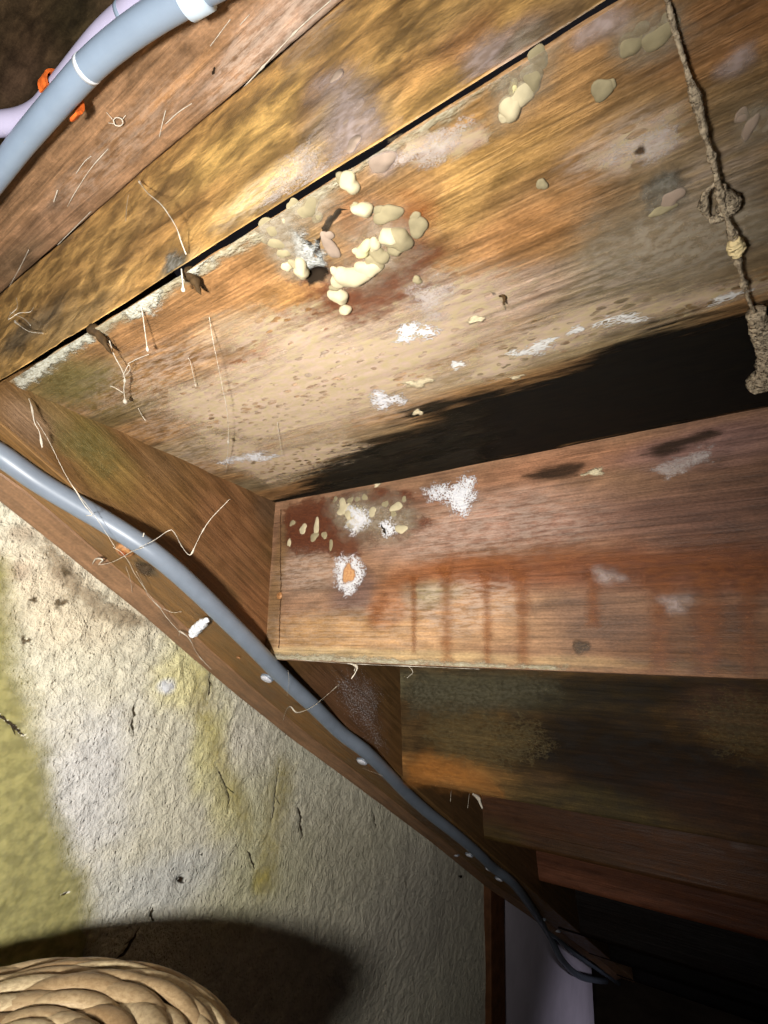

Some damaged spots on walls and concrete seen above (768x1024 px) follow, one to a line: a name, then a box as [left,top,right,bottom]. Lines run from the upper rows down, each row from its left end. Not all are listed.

water stain [624,173,767,270]
water stain [155,203,768,598]
crack [0,715,24,735]
crack [215,764,234,804]
crack [271,769,303,839]